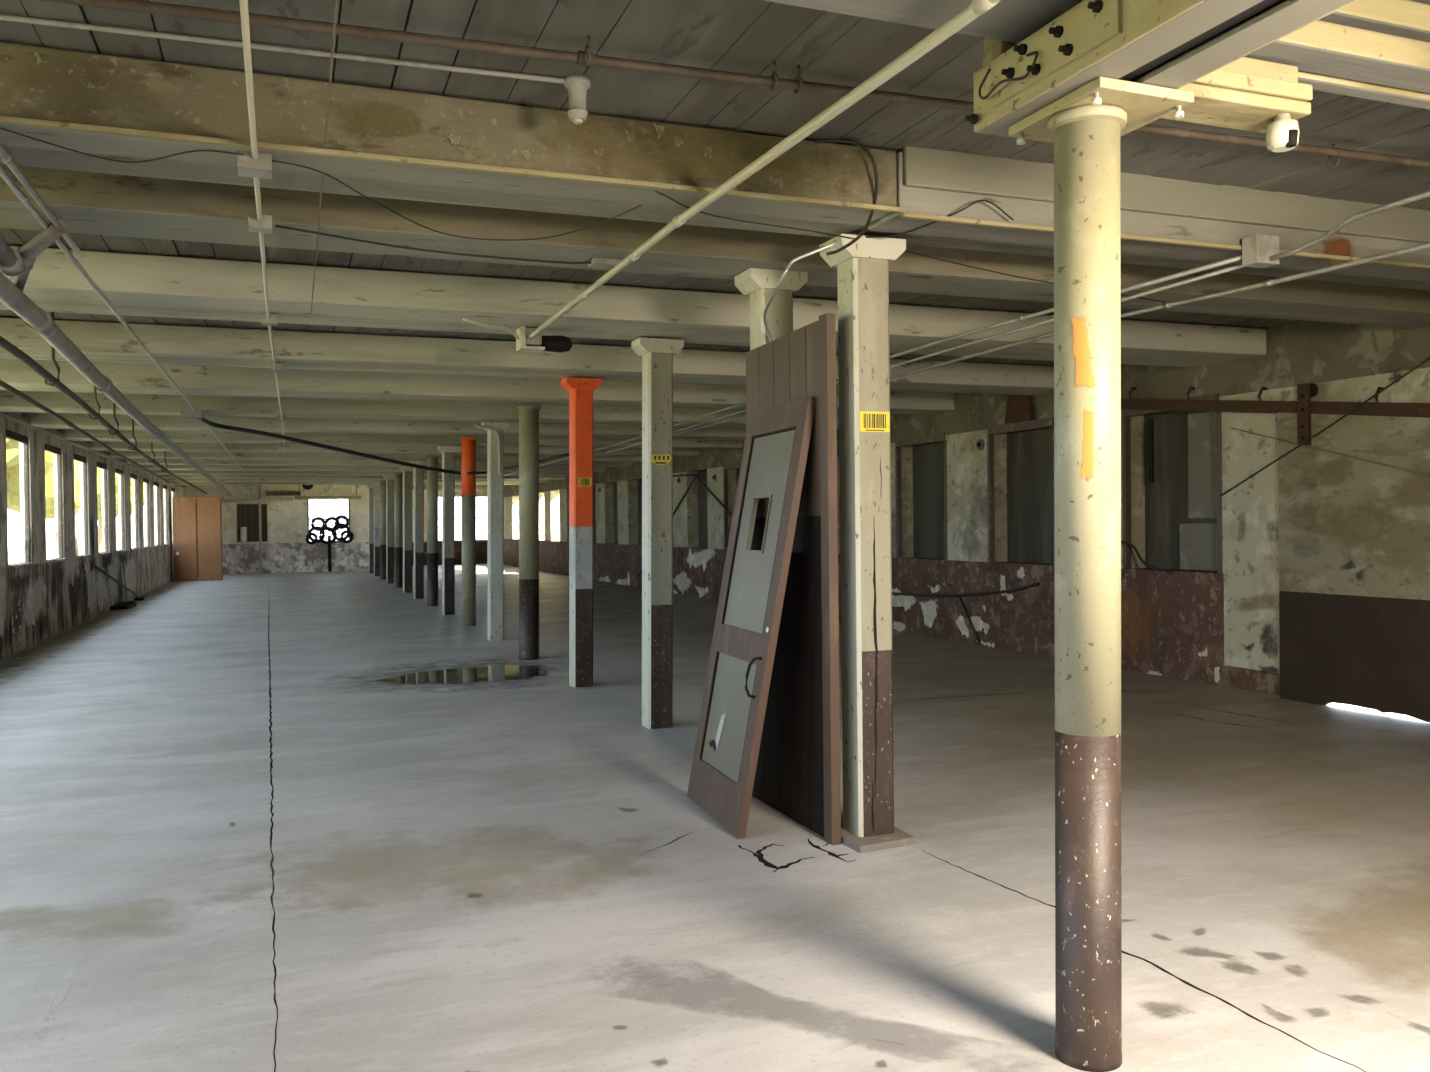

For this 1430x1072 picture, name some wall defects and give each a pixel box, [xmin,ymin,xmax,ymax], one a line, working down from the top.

leakage [0,519,127,650]
peeling [600,571,630,586]
peeling [673,548,718,598]
peeling [892,584,940,632]
peeling [956,605,994,647]
peeling [1000,567,1025,601]
crack [738,529,878,872]
crack [268,599,278,1072]
leakage [640,975,946,1053]